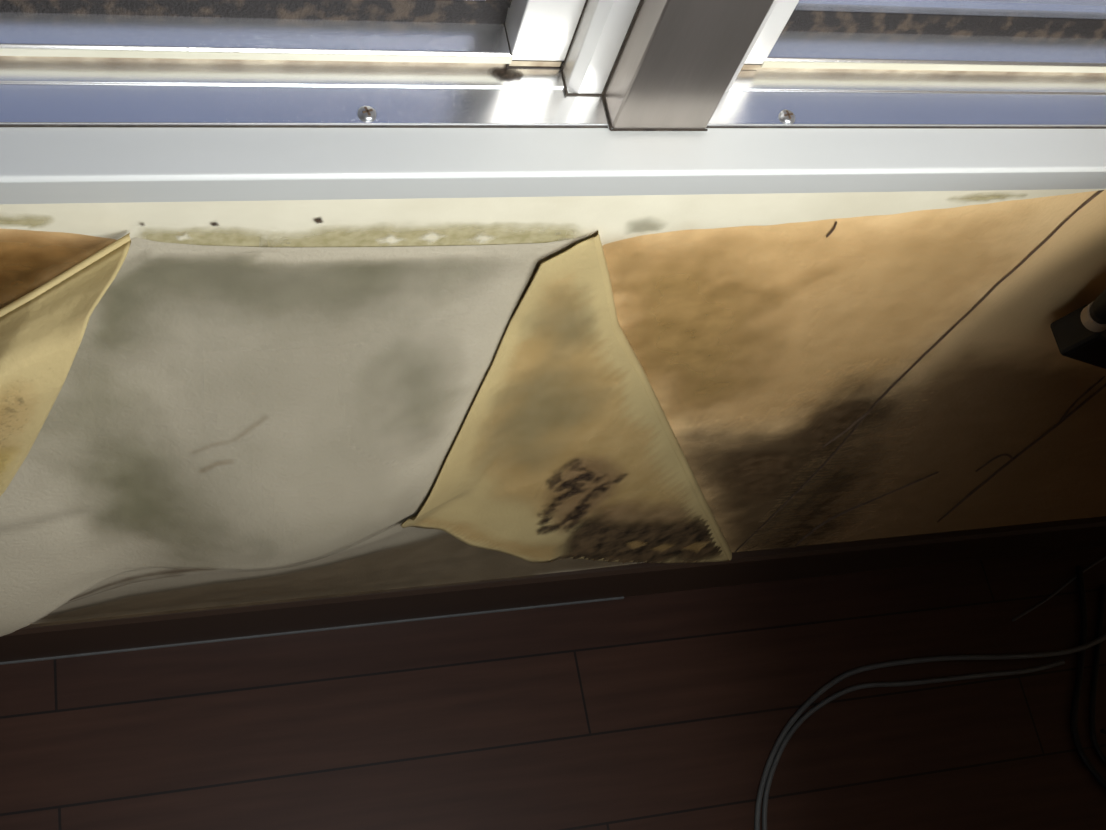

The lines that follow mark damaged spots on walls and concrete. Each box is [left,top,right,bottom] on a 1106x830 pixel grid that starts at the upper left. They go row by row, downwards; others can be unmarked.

damp [44,367,1106,626]